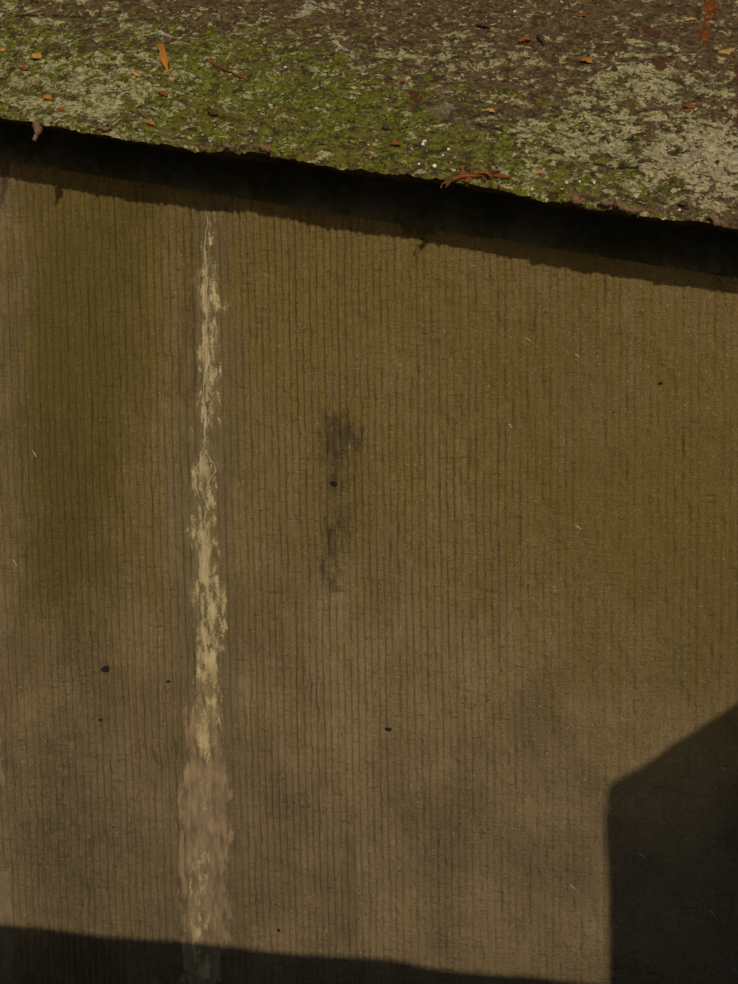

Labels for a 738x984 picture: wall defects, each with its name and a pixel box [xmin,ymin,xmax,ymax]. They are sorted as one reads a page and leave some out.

damp [175,210,238,984]